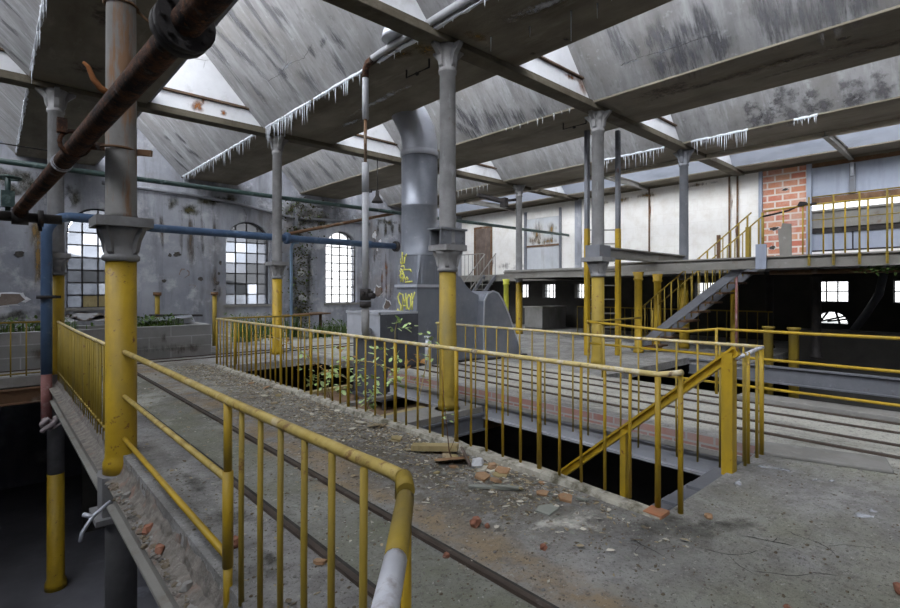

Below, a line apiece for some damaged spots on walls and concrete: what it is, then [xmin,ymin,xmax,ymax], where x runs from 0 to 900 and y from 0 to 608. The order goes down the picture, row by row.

leakage [607,0,896,95]
mould [839,73,891,106]
leakage [691,87,833,155]
peeling [0,292,31,307]
crack [635,534,871,581]